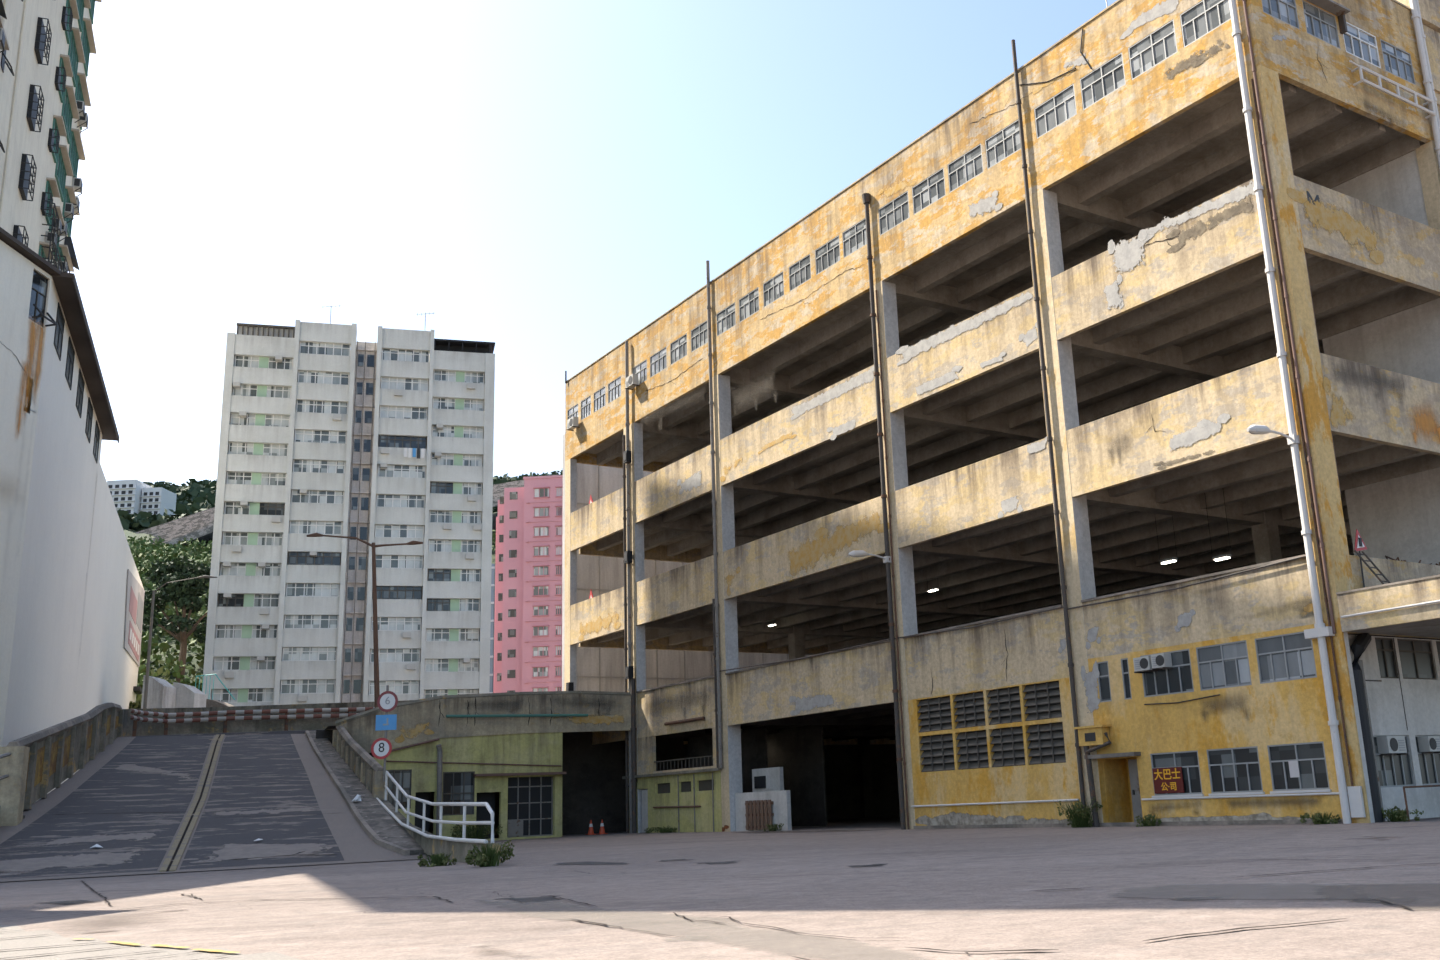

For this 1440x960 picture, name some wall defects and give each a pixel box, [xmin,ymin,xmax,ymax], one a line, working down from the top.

peeling [1120,0,1179,39]
peeling [1103,180,1256,309]
rust [18,321,44,432]
peeling [1153,413,1230,470]